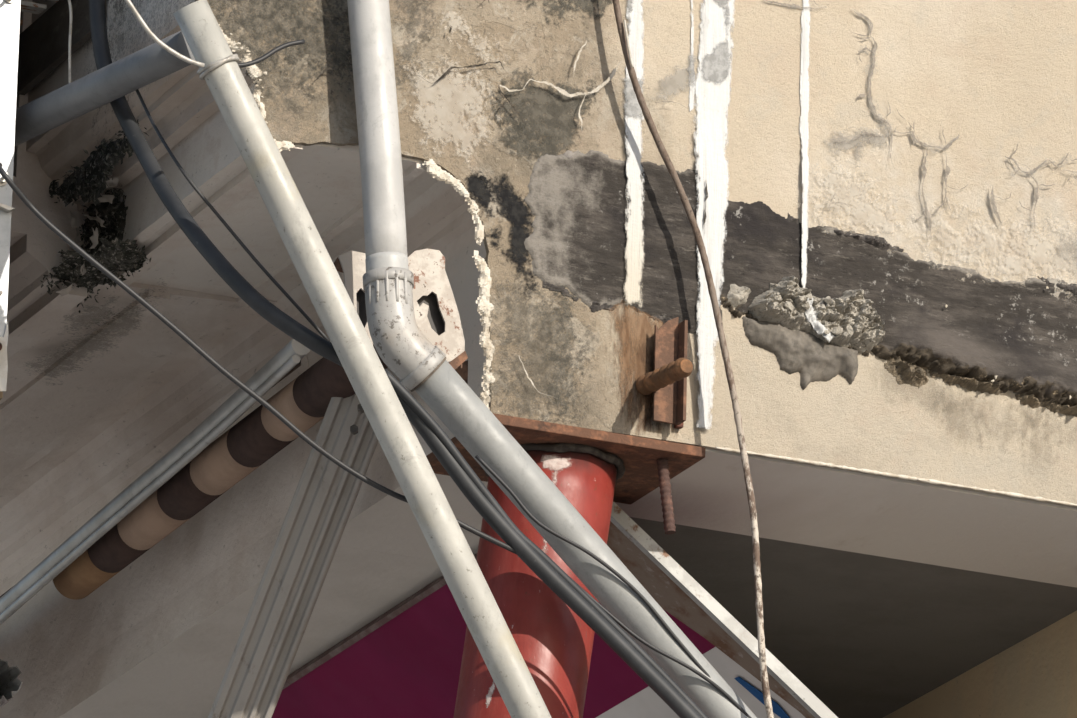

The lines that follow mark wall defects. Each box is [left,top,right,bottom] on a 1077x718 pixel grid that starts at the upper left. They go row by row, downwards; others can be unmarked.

crack [412,61,525,123]
leakage [465,167,537,300]
leakage [489,69,597,160]
leakage [518,0,612,25]
peeling [524,150,701,334]
leakage [623,0,644,307]
leakage [659,0,735,430]
peeling [719,200,1077,417]
crack [836,11,1077,238]